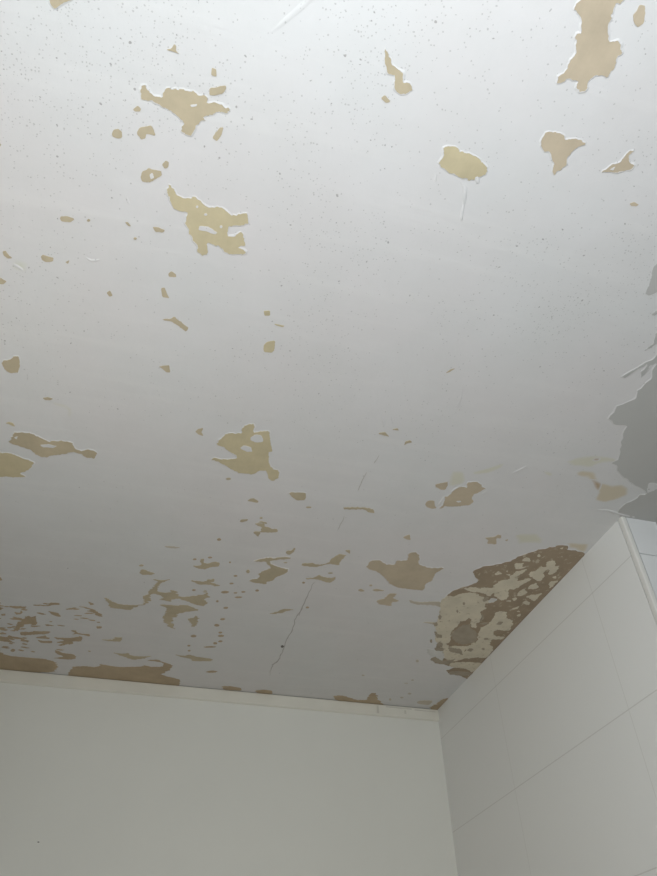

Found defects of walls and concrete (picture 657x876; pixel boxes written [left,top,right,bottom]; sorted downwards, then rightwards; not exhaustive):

peeling [133,68,231,139]
peeling [382,48,413,103]
peeling [555,0,625,94]
peeling [437,144,489,181]
peeling [539,130,586,175]
peeling [141,161,250,256]
peeling [0,422,98,478]
peeling [211,423,281,481]
peeling [607,333,657,523]
peeling [425,481,486,509]
peeling [358,551,444,607]
peeling [0,548,295,686]